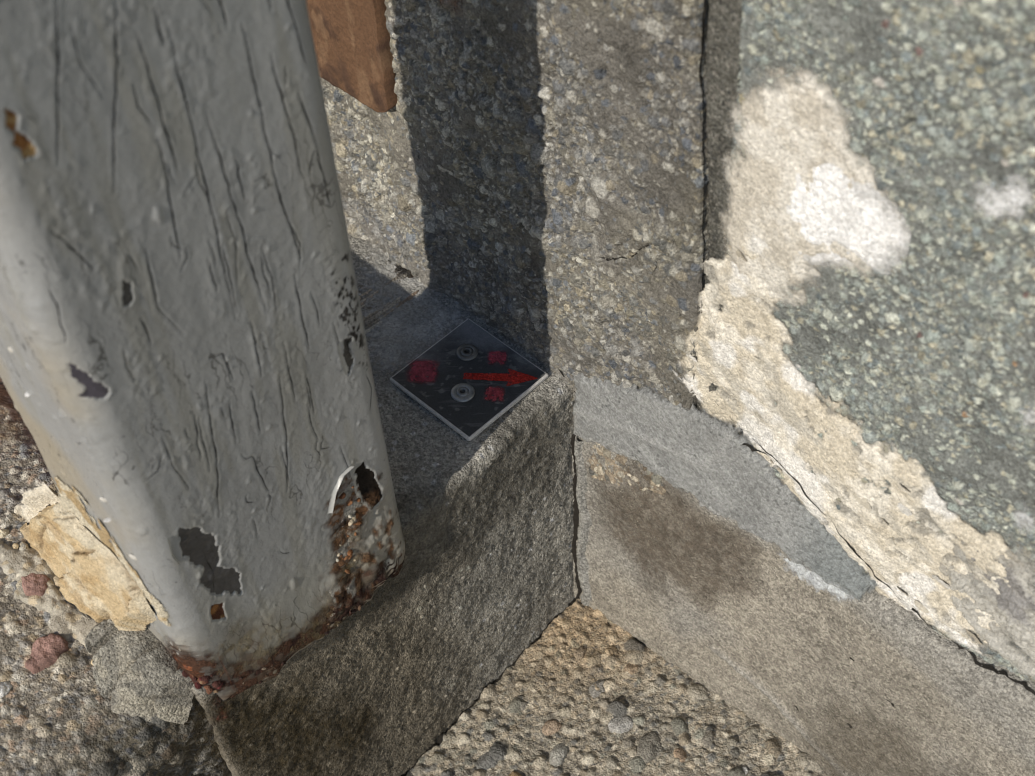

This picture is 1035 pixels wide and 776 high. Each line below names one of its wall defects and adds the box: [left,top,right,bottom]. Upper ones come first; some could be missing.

corrosion [4,109,37,159]
crack [698,0,706,313]
water stain [722,67,911,306]
spalling [0,540,98,674]
peeling [69,363,109,399]
peeling [178,527,241,595]
corrosion [167,475,405,697]
crack [400,433,592,776]
crack [714,400,892,590]
flaking render [673,234,1016,655]
crack [912,608,1035,695]